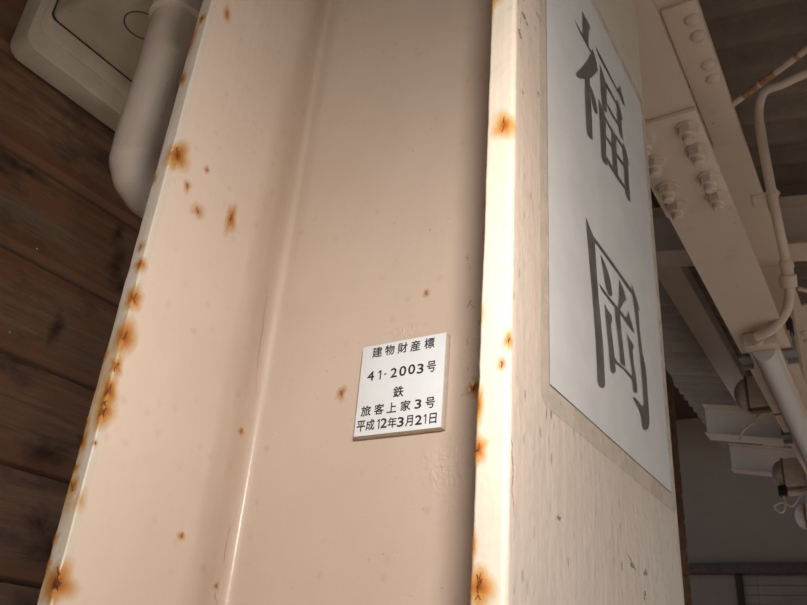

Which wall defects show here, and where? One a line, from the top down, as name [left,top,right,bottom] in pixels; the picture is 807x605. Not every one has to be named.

rust [496,116,514,134]
rust [168,145,186,166]
rust [126,288,140,307]
rust [116,322,133,349]
rust [79,351,121,451]
rust [475,438,485,460]
rust [44,558,72,600]
rust [470,571,491,601]